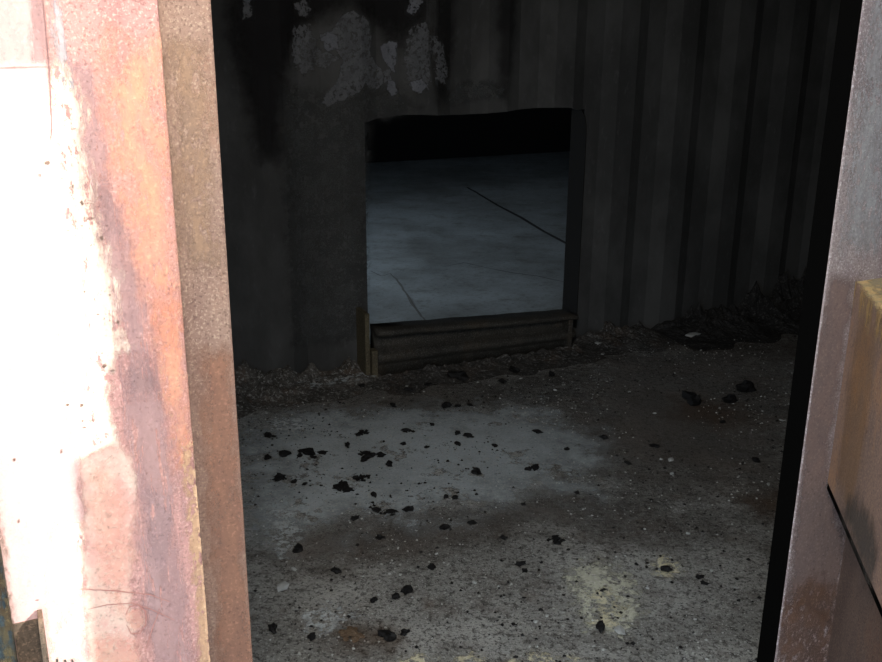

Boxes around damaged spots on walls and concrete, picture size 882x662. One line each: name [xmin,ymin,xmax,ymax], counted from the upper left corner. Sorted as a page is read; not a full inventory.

rust [114,40,181,292]
peeling [291,0,448,107]
rust [162,305,253,662]
rust [779,581,834,662]